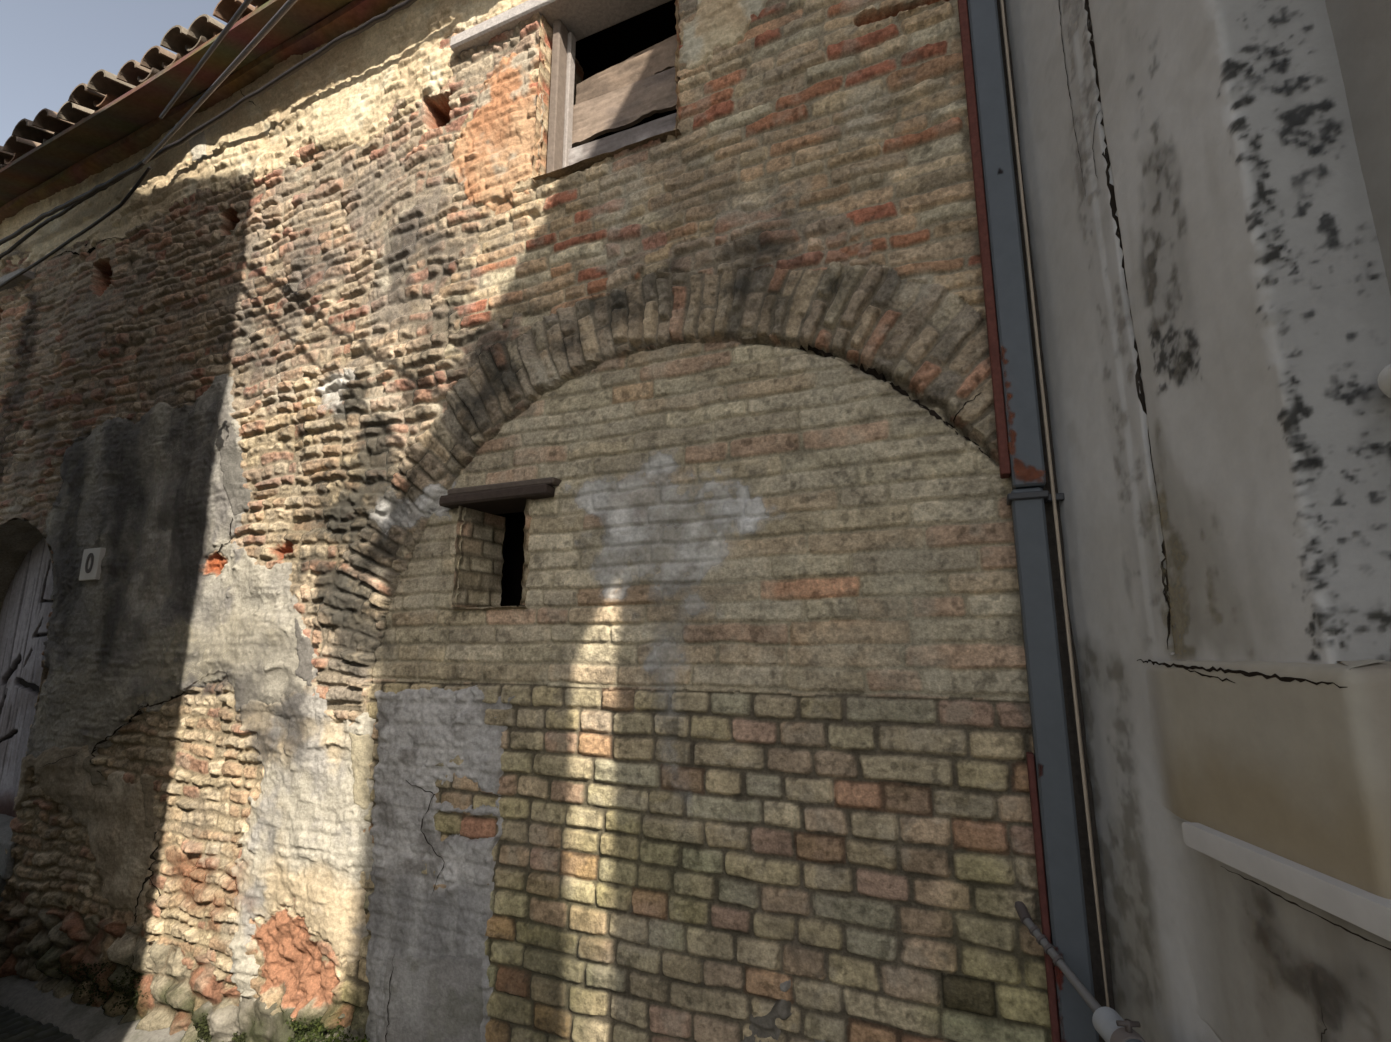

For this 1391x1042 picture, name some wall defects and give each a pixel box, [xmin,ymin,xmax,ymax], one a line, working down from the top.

damp [1218,8,1340,287]
damp [387,222,420,276]
damp [435,328,518,459]
rust [1001,347,1043,481]
crack [1059,0,1347,688]
damp [1278,377,1322,481]
damp [287,369,450,666]
damp [575,454,766,599]
damp [1301,538,1344,589]
damp [1309,613,1344,660]
damp [1361,611,1391,631]
peeling [14,374,376,1042]